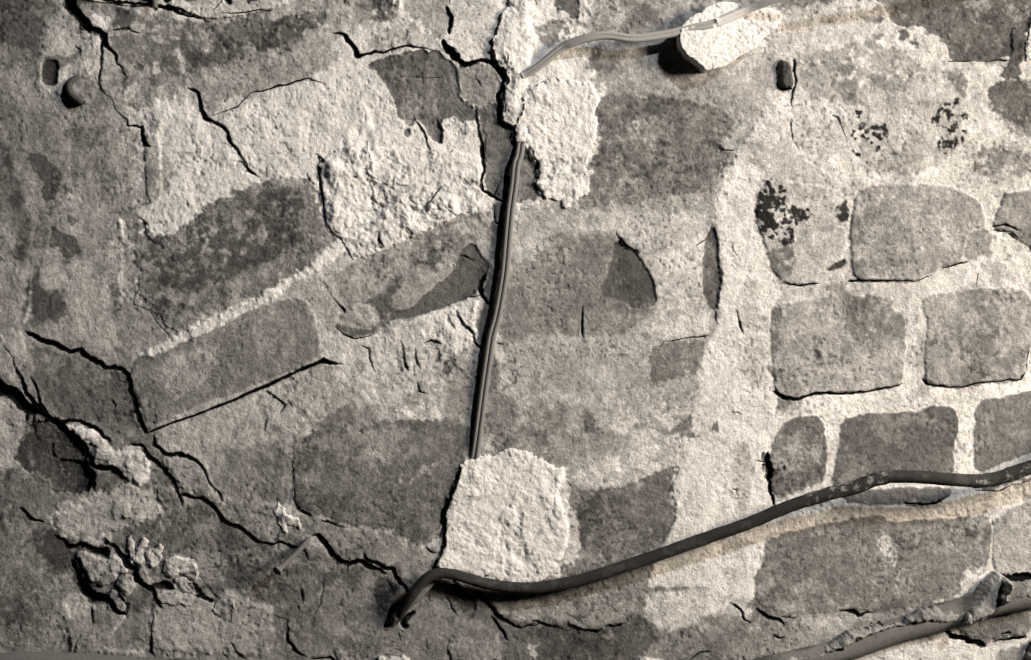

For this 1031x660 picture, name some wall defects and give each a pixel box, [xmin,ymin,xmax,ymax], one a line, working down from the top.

crack [65,0,273,147]
crack [188,78,325,178]
crack [307,153,339,238]
crack [333,0,541,228]
crack [325,282,376,371]
crack [401,255,504,394]
spalling [14,418,96,494]
flaking render [76,535,204,611]
crack [0,331,408,660]
crack [426,467,625,641]